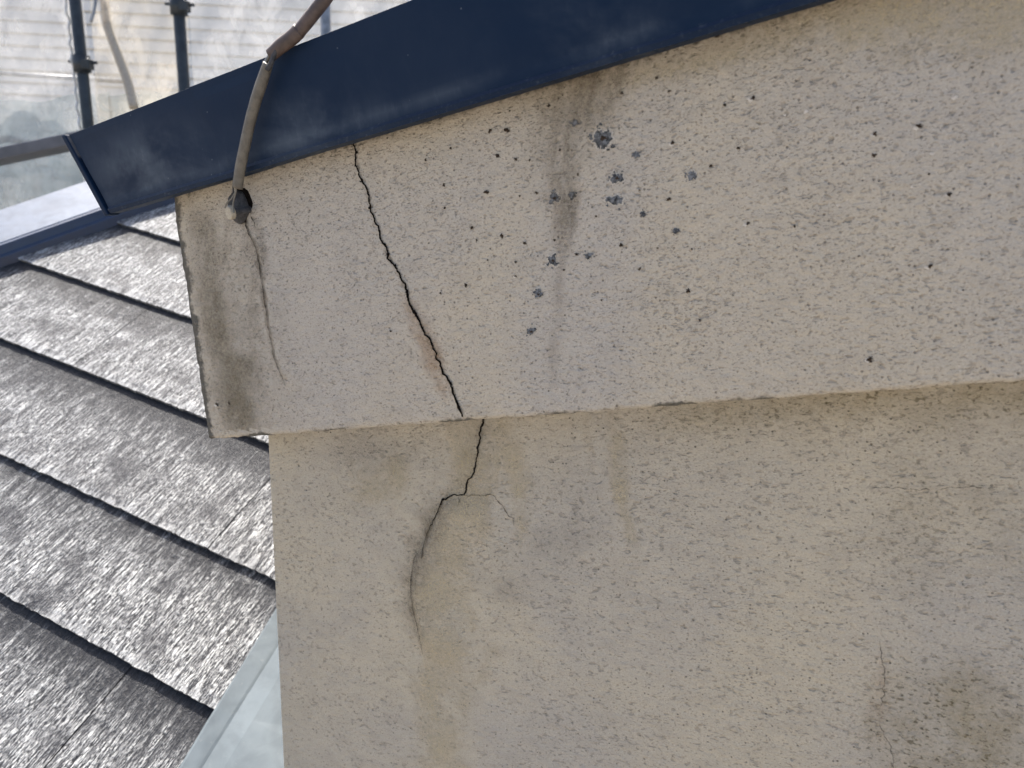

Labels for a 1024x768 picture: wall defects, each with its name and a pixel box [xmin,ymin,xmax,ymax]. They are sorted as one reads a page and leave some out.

crack [353,144,514,650]